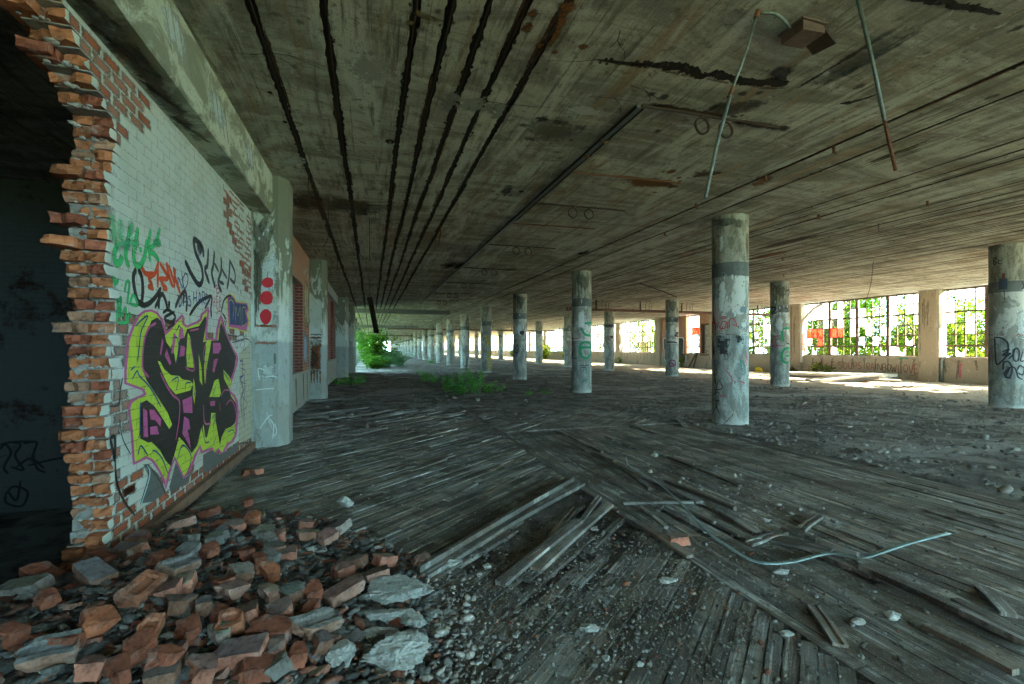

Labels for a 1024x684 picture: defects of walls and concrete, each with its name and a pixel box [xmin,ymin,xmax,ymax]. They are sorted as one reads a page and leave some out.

crack [906,0,1002,15]
peeling [69,11,151,144]
spalling [249,0,574,339]
rust [572,170,720,193]
crack [550,30,792,115]
spalling [723,61,1024,194]
spalling [750,137,1024,237]
peeling [223,184,277,298]
peeling [530,288,587,328]